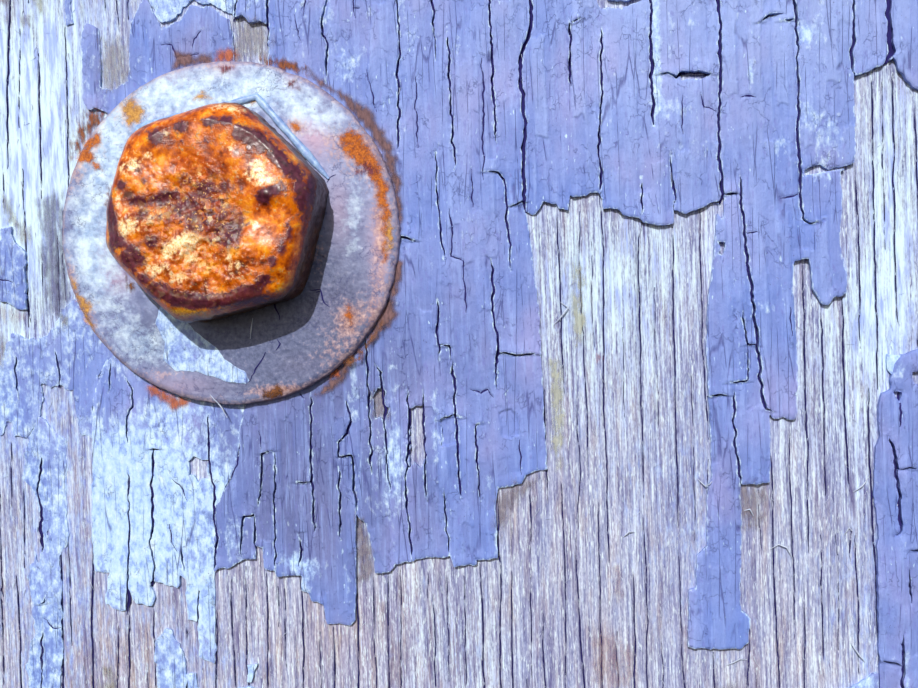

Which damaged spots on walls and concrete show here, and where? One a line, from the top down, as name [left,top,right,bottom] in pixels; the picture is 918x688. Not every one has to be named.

corrosion [123,100,143,125]
crack [264,0,272,48]
crack [294,0,329,74]
crack [249,304,281,382]
peeling [0,0,547,688]
crack [338,0,918,688]
peeling [521,0,918,688]
crack [186,394,335,688]